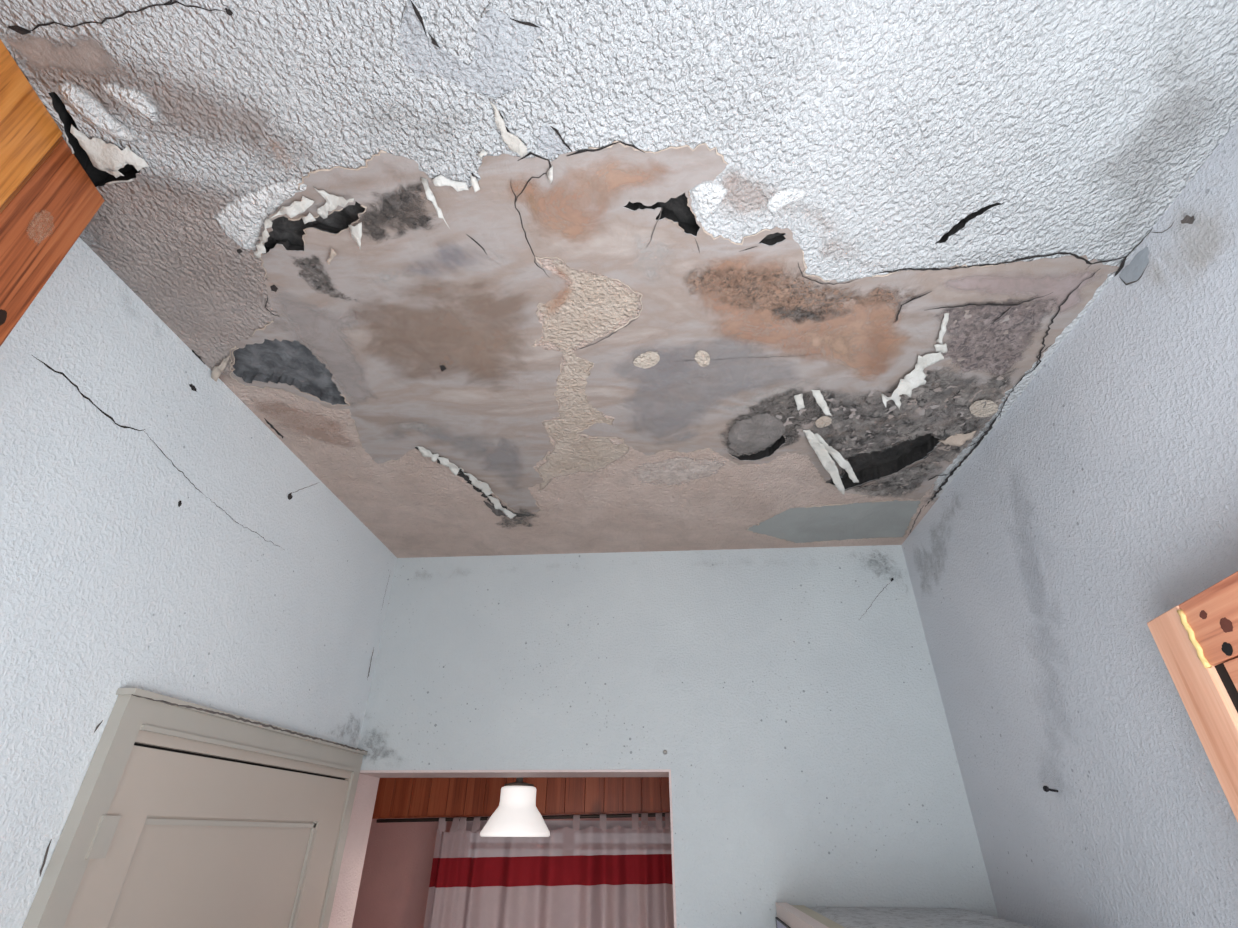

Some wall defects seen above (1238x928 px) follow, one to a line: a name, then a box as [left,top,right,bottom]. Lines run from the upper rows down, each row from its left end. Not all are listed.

crack [7,0,227,35]
spalling [48,92,150,187]
crack [32,355,284,550]
water stain [85,163,936,558]
peeling [192,0,1149,543]
crack [798,202,1153,535]
spalling [1153,215,1195,233]